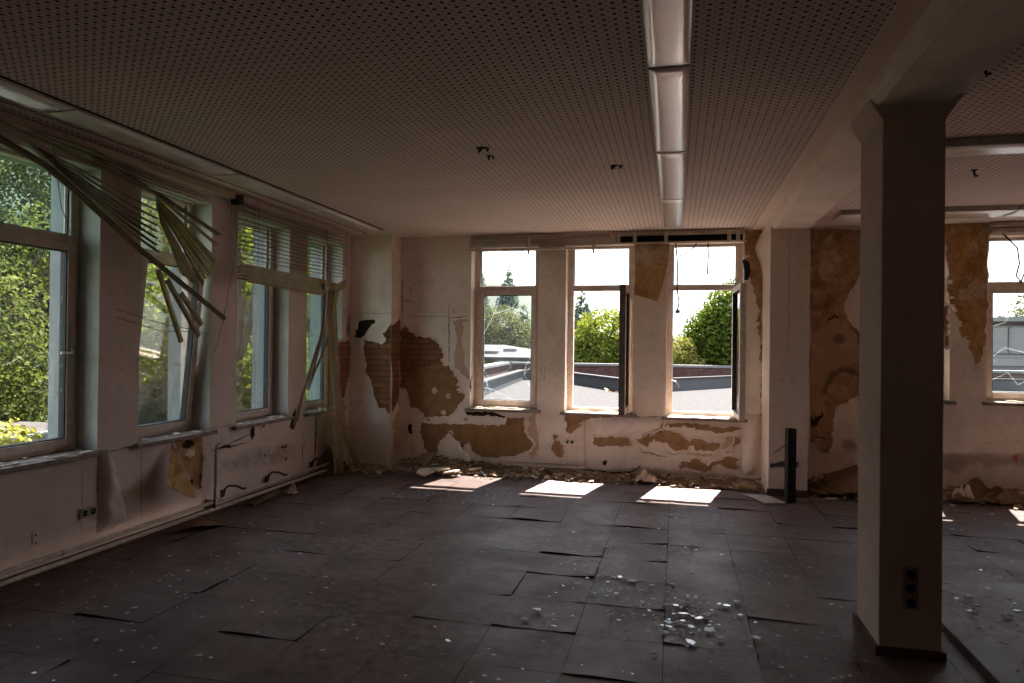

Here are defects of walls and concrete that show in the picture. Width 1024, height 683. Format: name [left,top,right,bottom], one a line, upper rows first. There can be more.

peeling [634,244,669,301]
peeling [944,278,986,350]
spalling [338,317,764,491]
peeling [165,437,204,499]